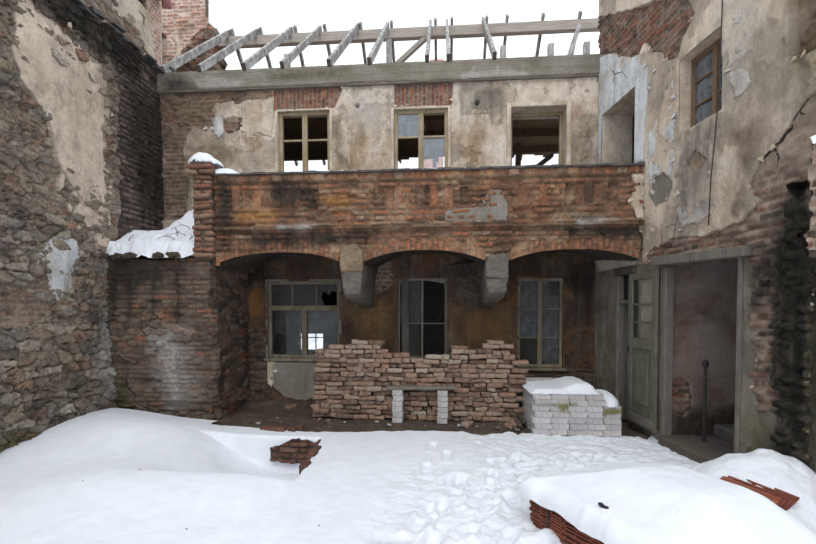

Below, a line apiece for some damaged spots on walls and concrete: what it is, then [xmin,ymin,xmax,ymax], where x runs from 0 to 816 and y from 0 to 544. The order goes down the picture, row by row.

flaking render [11,0,114,255]
flaking render [159,86,344,220]
flaking render [598,0,695,232]
peeling [724,60,751,100]
crack [761,98,809,164]
flaking render [32,237,80,305]
flaking render [644,94,816,464]
leakage [751,196,816,467]